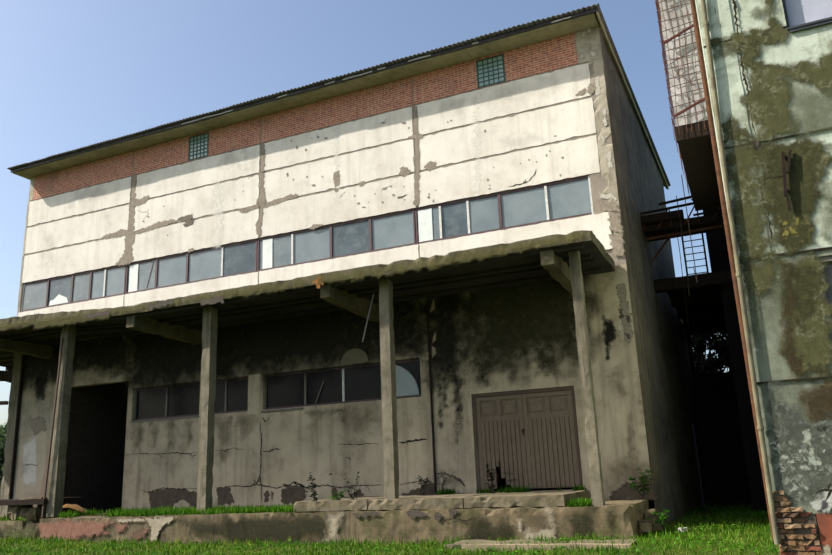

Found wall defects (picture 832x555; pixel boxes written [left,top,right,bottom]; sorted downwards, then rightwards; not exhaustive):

crack [714,0,749,94]
leakage [582,274,600,332]
leakage [22,344,60,400]
leakage [72,334,203,393]
leakage [216,310,381,385]
leakage [393,280,579,442]
crack [127,418,379,499]
crack [399,437,428,445]
peeling [776,426,826,469]
peeling [0,516,173,541]
flaking render [773,484,832,555]